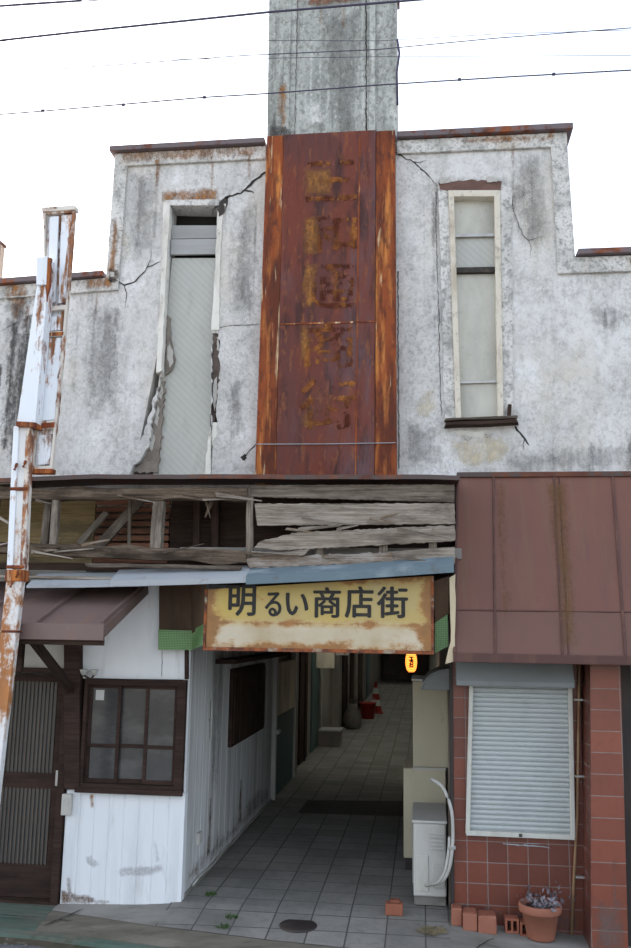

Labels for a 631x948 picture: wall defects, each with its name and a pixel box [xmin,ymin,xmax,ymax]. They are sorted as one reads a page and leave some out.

corrosion [123,147,252,179]
corrosion [162,188,216,200]
crack [212,171,266,216]
crack [113,259,161,307]
water stain [0,297,31,454]
flaking render [133,315,176,474]
flaking render [212,335,220,422]